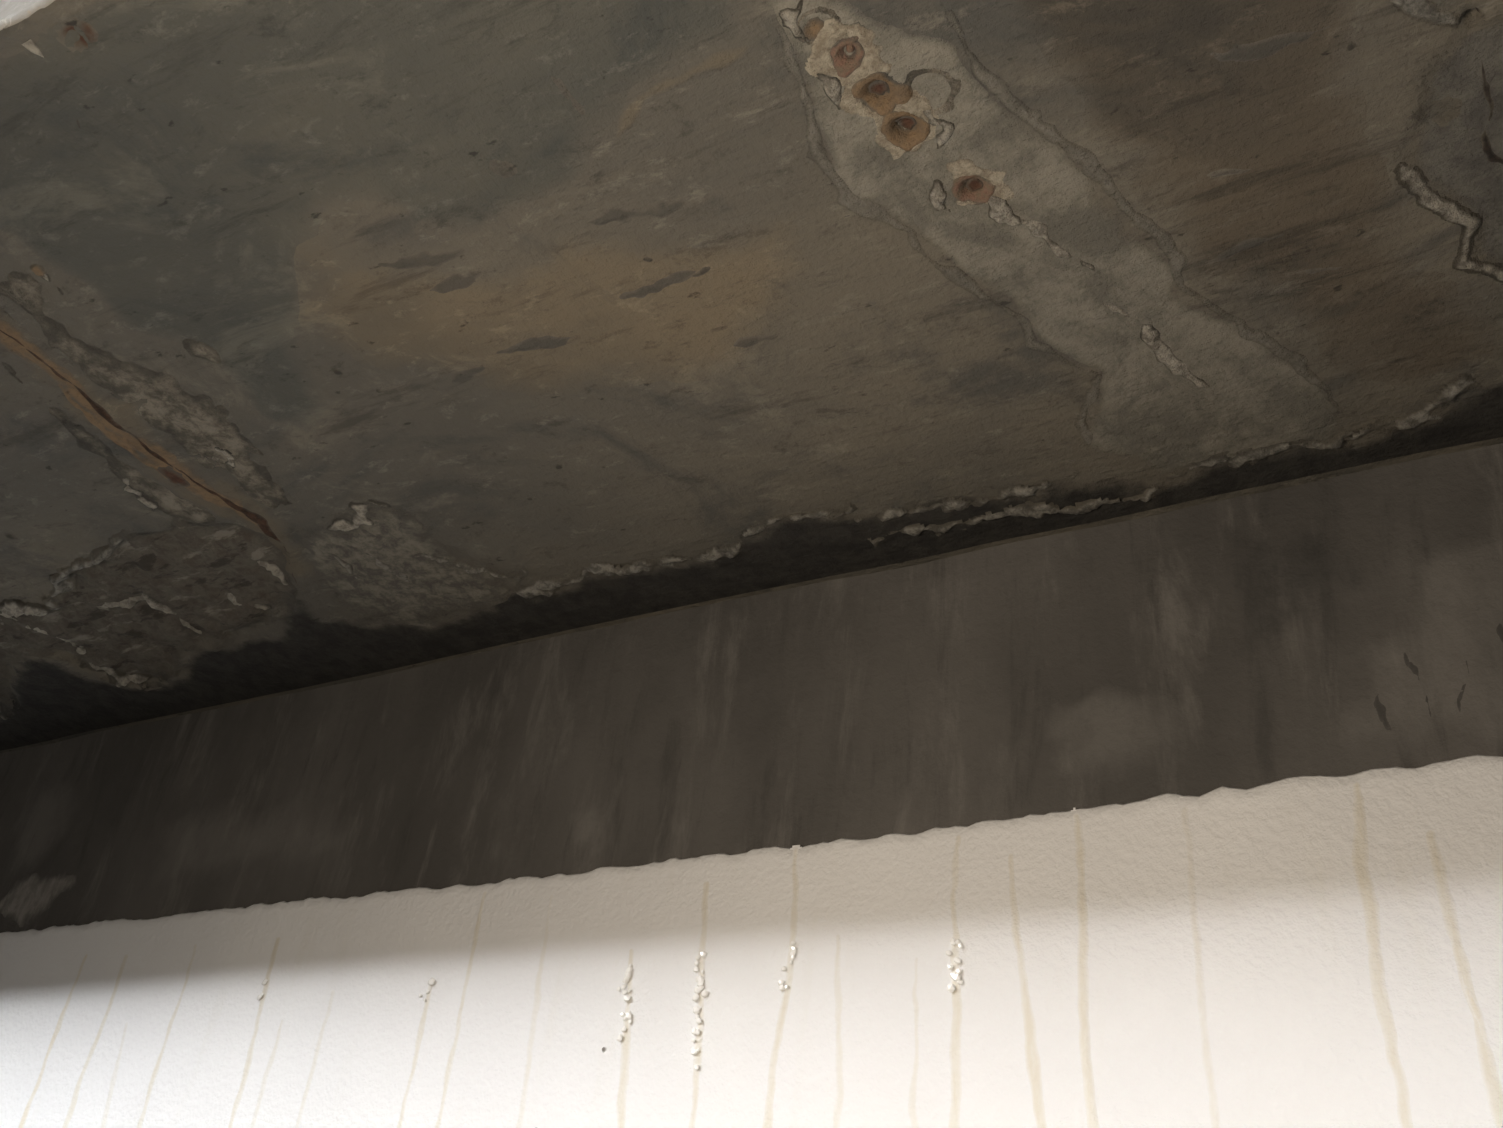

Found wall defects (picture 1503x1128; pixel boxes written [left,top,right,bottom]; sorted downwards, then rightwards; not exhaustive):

leakage [0,765,86,927]
leakage [228,937,284,1128]
leakage [397,977,435,1128]
leakage [616,949,634,1128]
leakage [688,881,710,1128]
leakage [762,845,802,1128]
leakage [946,835,963,1128]
leakage [1008,853,1048,1128]
leakage [1071,808,1100,1128]
leakage [1181,806,1221,1128]
leakage [1351,782,1414,1128]
leakage [1425,830,1503,1128]